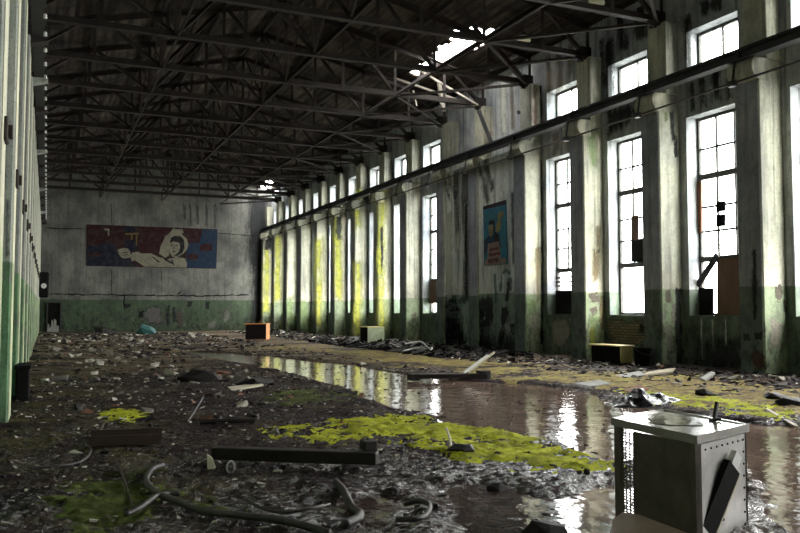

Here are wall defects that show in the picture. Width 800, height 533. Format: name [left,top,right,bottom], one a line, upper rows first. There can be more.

leakage [699,0,722,17]
leakage [684,13,692,67]
leakage [479,282,515,351]
flaking render [588,292,644,346]